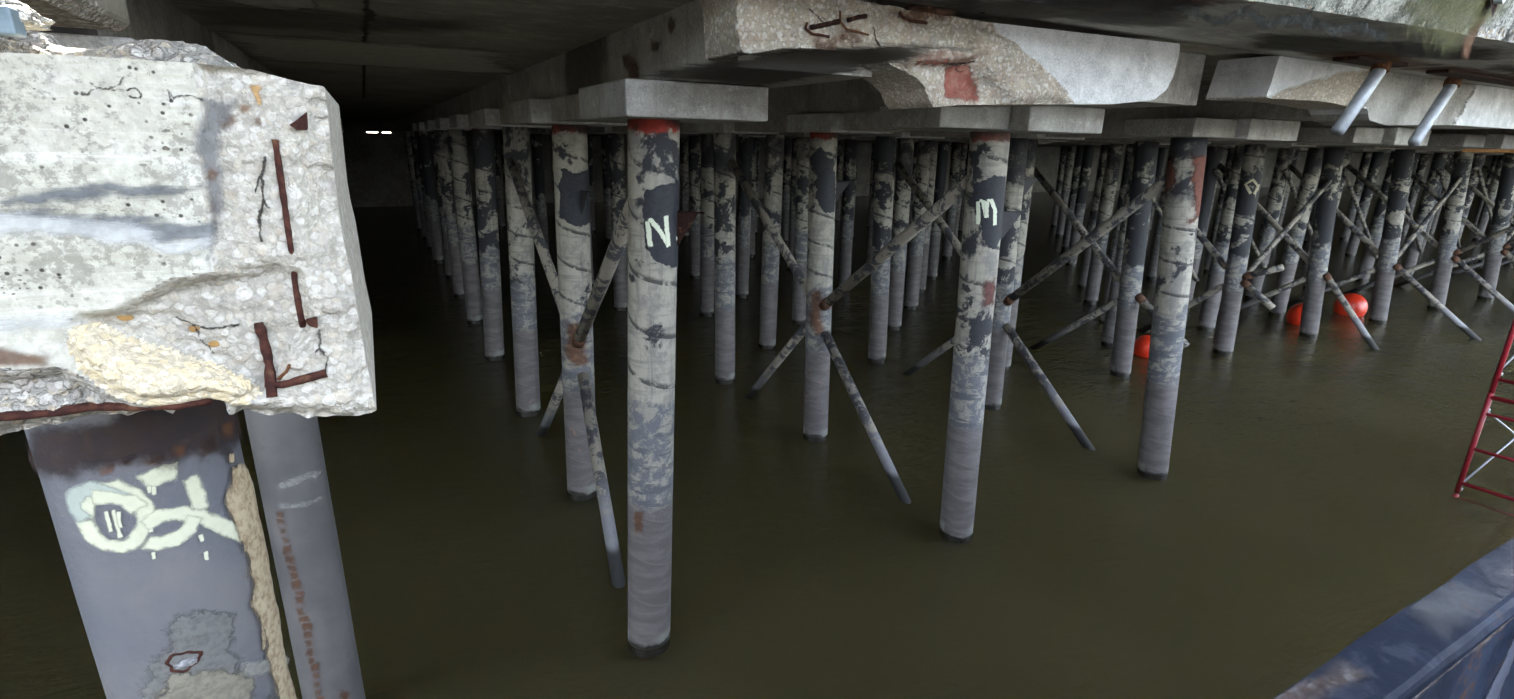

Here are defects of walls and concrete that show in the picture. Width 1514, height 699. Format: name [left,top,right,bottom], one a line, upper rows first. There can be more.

crack [361,0,376,98]
rust [290,112,308,130]
crack [255,156,269,242]
spalling [0,64,377,436]
rust [306,316,318,328]
rust [27,399,242,476]
peeling [140,453,297,699]